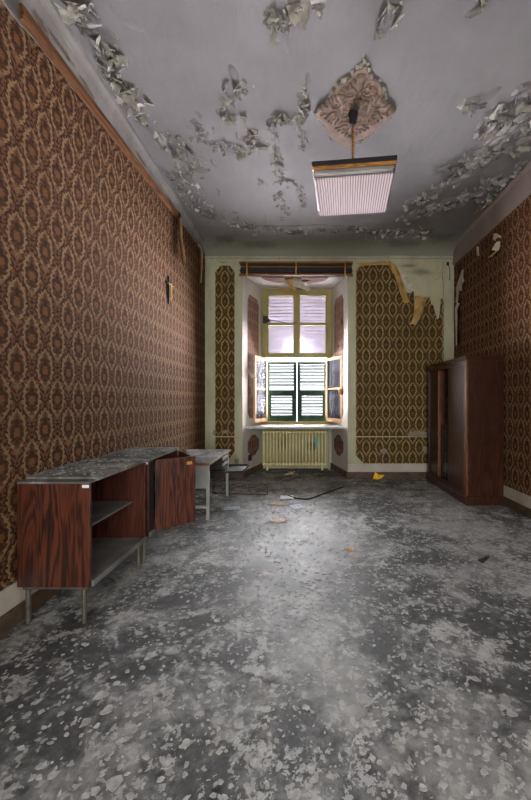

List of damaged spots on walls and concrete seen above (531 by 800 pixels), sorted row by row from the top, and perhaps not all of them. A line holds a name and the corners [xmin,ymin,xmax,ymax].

peeling [374,0,404,41]
peeling [55,0,368,239]
peeling [348,82,531,242]